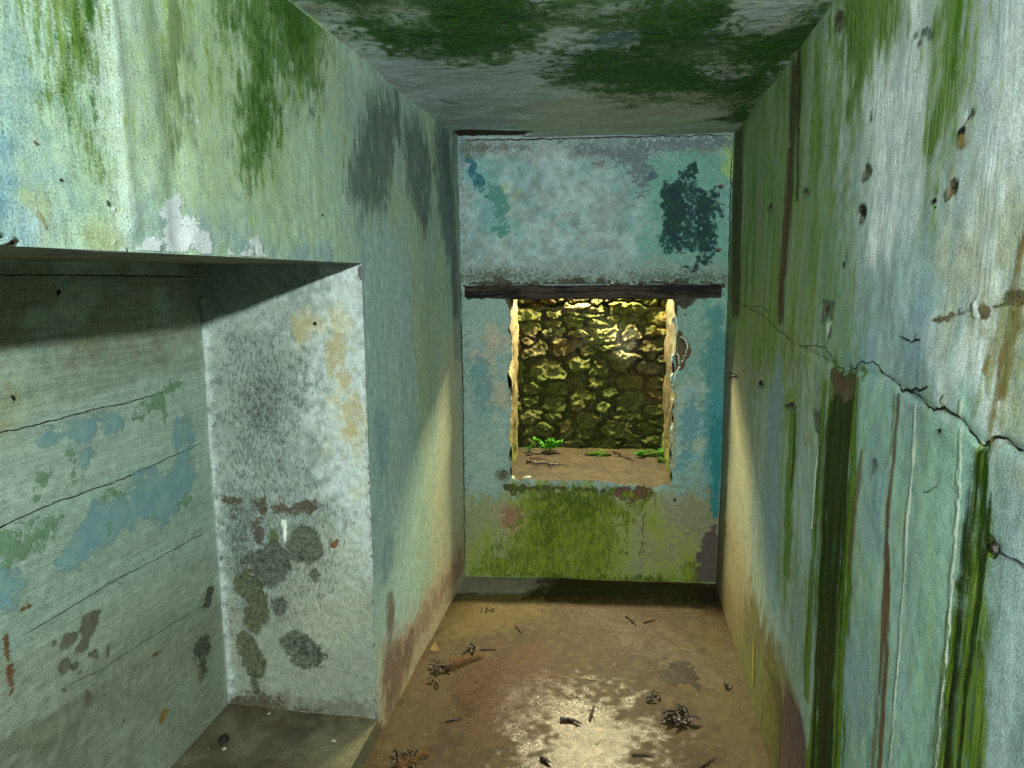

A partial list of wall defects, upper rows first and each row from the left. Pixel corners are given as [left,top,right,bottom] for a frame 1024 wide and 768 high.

peeling [106,189,213,254]
peeling [228,235,267,257]
damp [556,125,744,321]
damp [778,48,801,327]
crack [0,392,161,433]
crack [0,442,204,528]
crack [25,531,207,634]
damp [220,494,320,581]
damp [804,371,857,768]
crack [726,299,1024,451]
corrosion [872,394,900,768]
damp [934,398,992,768]